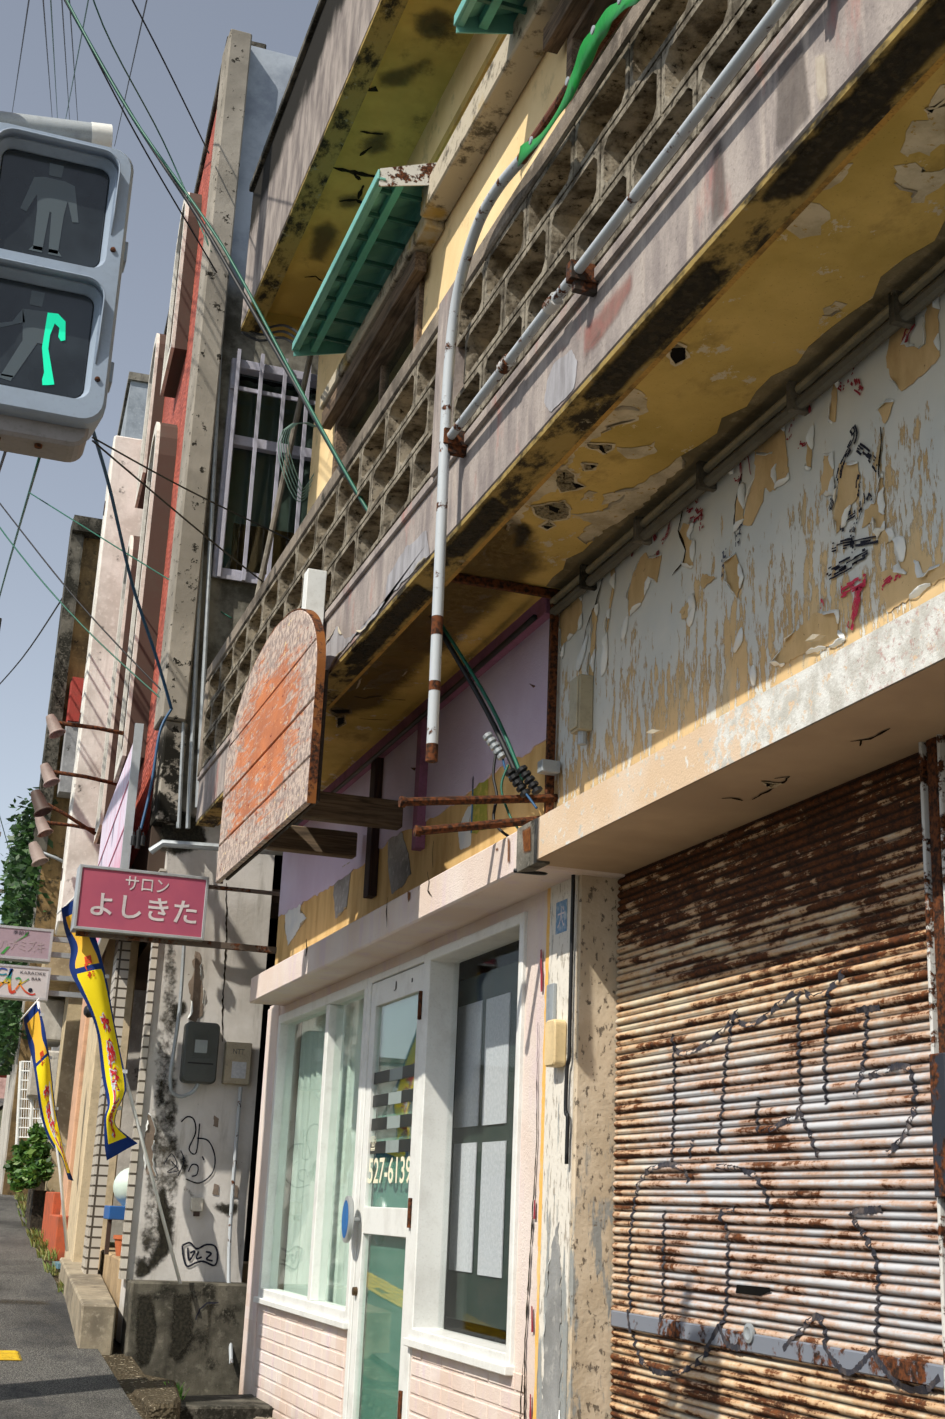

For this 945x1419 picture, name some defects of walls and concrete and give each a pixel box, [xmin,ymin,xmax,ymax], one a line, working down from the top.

leakage [419,10,450,38]
peeling [786,163,853,239]
leakage [762,0,945,203]
peeling [894,85,945,203]
leakage [583,263,720,400]
peeling [506,221,945,627]
leakage [332,498,538,716]
peeling [558,552,662,677]
peeling [750,609,846,686]
peeling [284,904,306,945]
leakage [135,944,188,1277]
leakage [136,1294,212,1364]